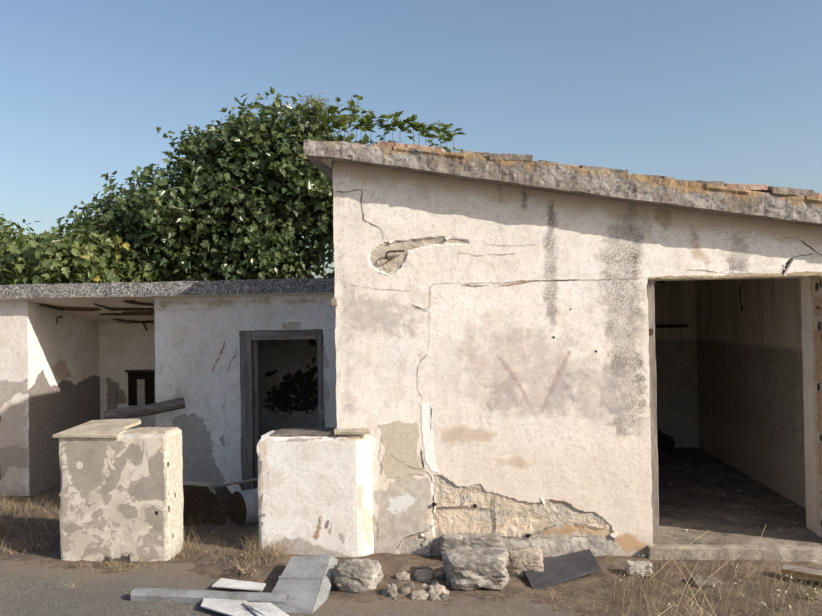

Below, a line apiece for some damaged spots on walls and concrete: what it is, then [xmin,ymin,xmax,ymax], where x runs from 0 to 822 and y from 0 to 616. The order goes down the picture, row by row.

crack [337,180,434,242]
crack [353,265,647,428]
water stain [544,205,557,320]
water stain [602,210,644,434]
spalling [648,271,822,281]
crack [695,236,822,276]
flaking render [814,330,822,433]
flaking render [59,439,176,562]
flaking render [374,421,431,555]
crack [378,439,435,552]